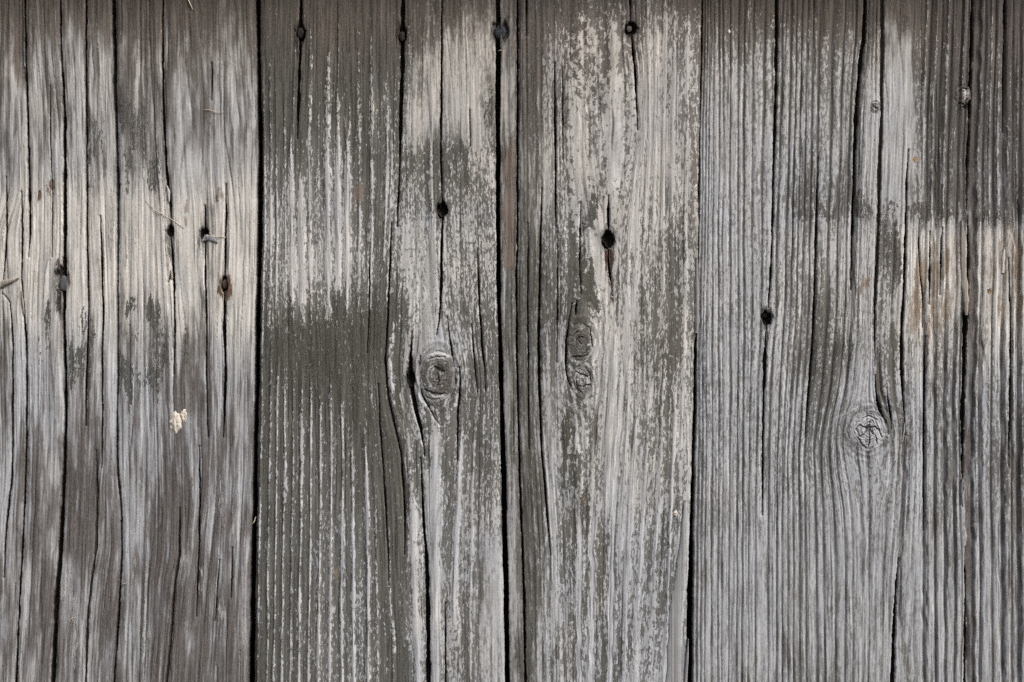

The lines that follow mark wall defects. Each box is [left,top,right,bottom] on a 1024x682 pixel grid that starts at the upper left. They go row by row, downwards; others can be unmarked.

crack [367,0,486,682]
peeling [502,135,515,271]
crack [605,198,613,289]
crack [762,0,778,511]
crack [850,0,972,510]